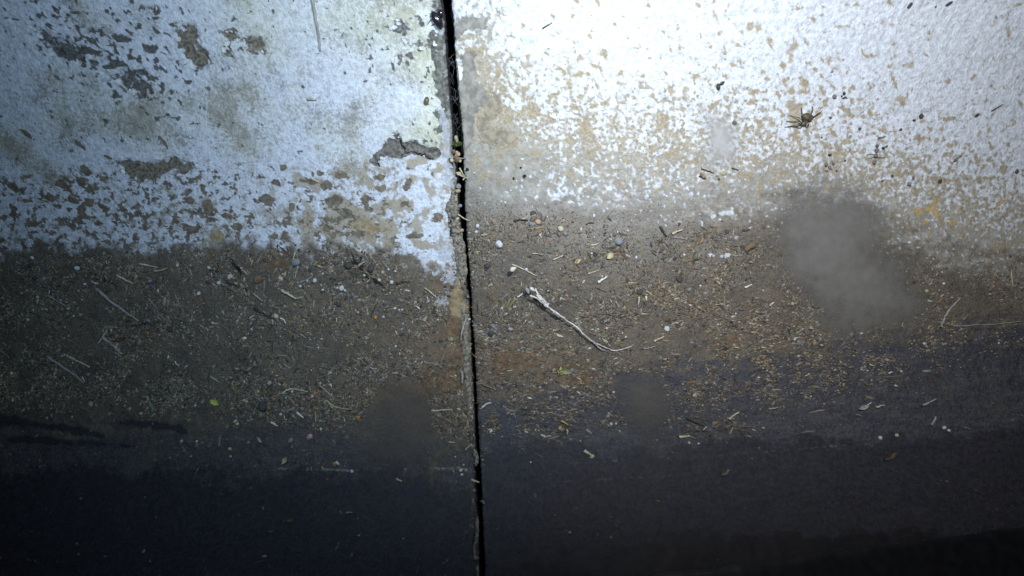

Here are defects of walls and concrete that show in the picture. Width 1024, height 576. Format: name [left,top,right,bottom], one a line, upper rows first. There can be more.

peeling [136,3,161,15]
peeling [27,24,154,99]
peeling [174,19,268,70]
peeling [389,18,437,65]
peeling [116,155,193,187]
spalling [369,133,469,183]
leakage [0,427,1024,576]